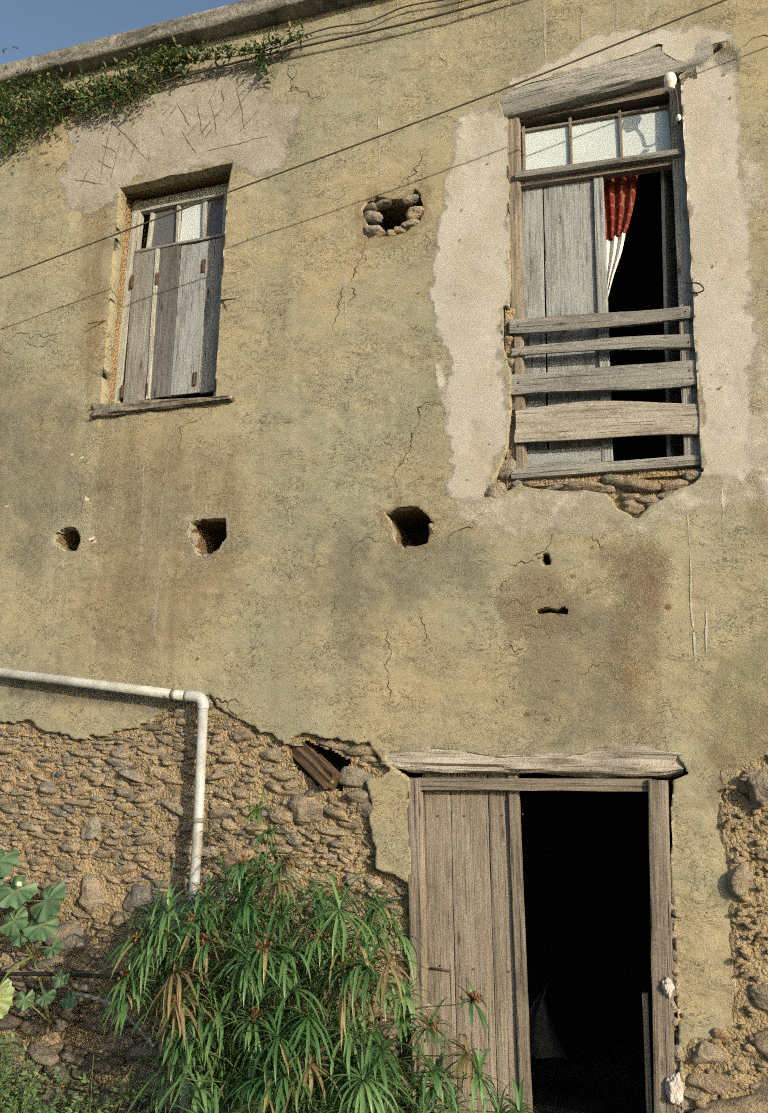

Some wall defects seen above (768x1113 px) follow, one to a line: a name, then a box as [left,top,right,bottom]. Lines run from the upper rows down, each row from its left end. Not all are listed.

crack [332,242,366,331]
crack [391,401,444,479]
spalling [183,512,227,558]
flaking render [0,696,412,1113]
flaking render [674,755,768,1113]